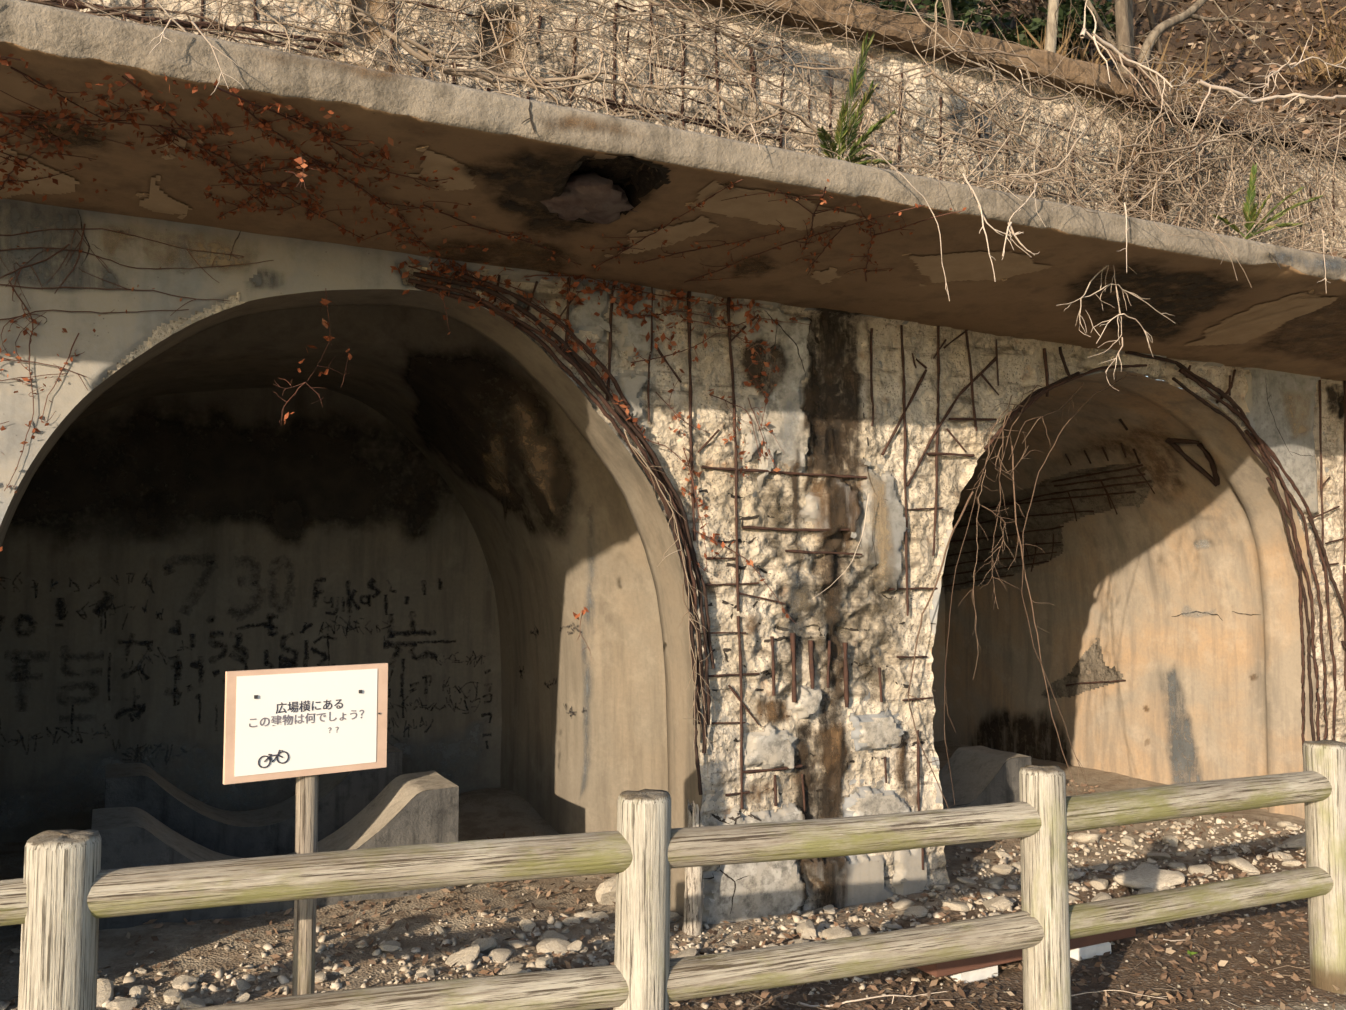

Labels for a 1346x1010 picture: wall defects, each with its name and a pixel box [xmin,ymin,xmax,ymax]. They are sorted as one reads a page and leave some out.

spalling [47,0,342,54]
spalling [389,0,1335,257]
water stain [775,308,891,820]
spalling [398,251,1346,826]
water stain [758,701,788,721]
water stain [799,856,847,911]
flaking render [702,846,1021,947]